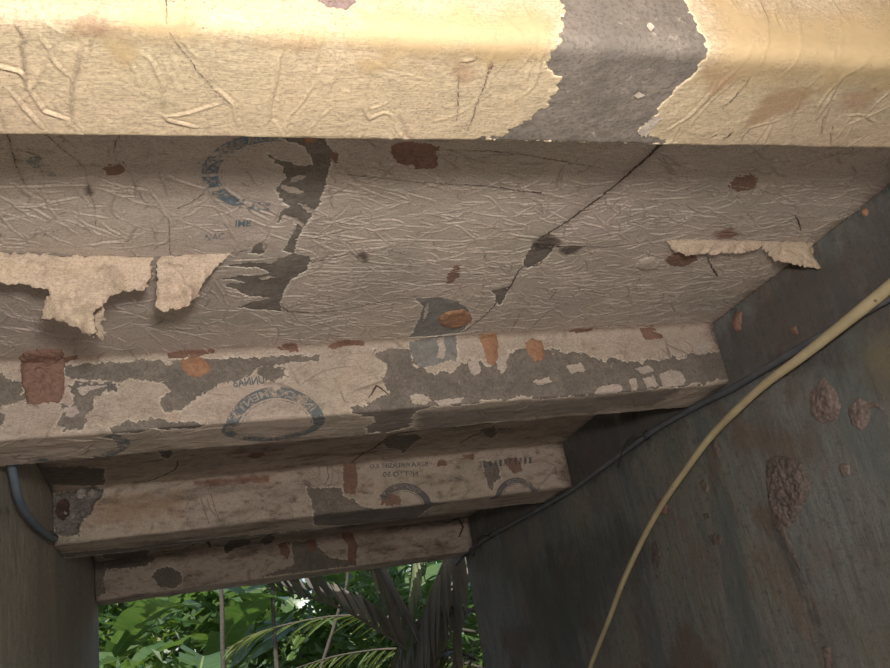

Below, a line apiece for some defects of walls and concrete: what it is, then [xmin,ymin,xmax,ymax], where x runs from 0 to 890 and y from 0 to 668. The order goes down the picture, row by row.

peeling [480,0,708,144]
peeling [222,138,333,311]
crack [451,144,663,333]
peeling [0,373,26,425]
peeling [57,354,320,433]
peeling [350,297,728,433]
spalling [39,466,106,537]
peeling [95,550,182,598]
peeling [224,535,277,553]
peeling [306,487,452,526]